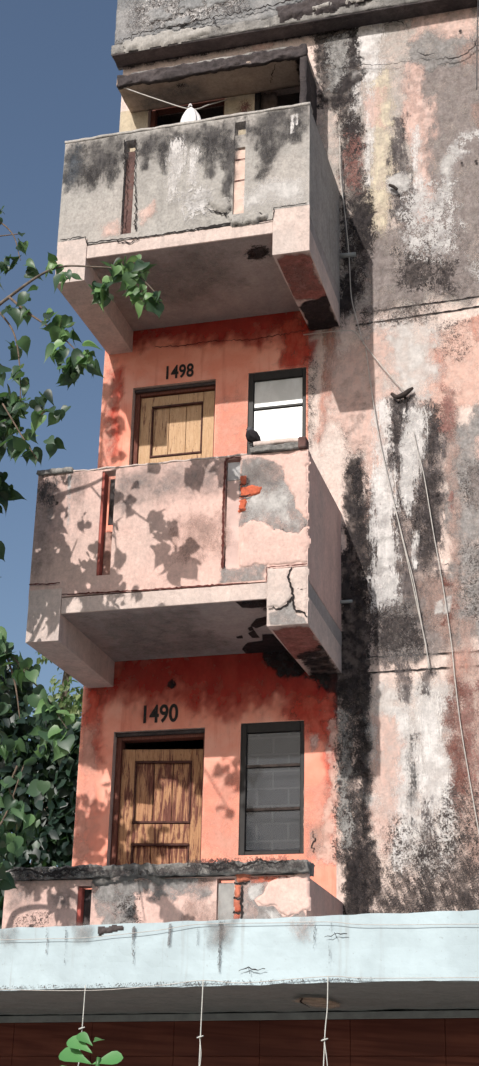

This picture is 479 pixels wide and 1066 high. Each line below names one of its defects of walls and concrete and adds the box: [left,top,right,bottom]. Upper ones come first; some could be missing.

spalling [276,0,369,23]
damp [62,23,466,368]
crack [29,456,307,617]
peeling [220,436,311,625]
damp [11,320,479,915]
peeling [310,720,340,865]
peeling [233,872,311,919]